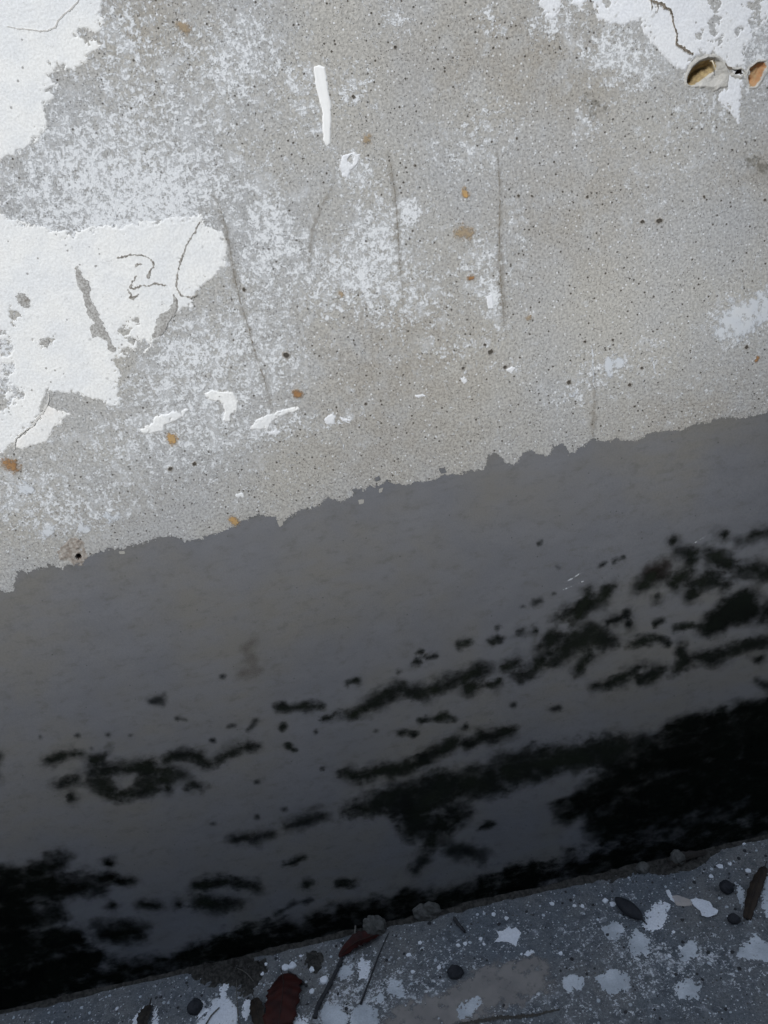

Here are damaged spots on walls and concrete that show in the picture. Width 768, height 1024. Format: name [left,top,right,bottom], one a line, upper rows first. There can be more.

flaking render [0,0,105,161]
flaking render [539,0,768,124]
crack [650,0,694,55]
flaking render [0,214,228,453]
flaking render [204,390,238,422]